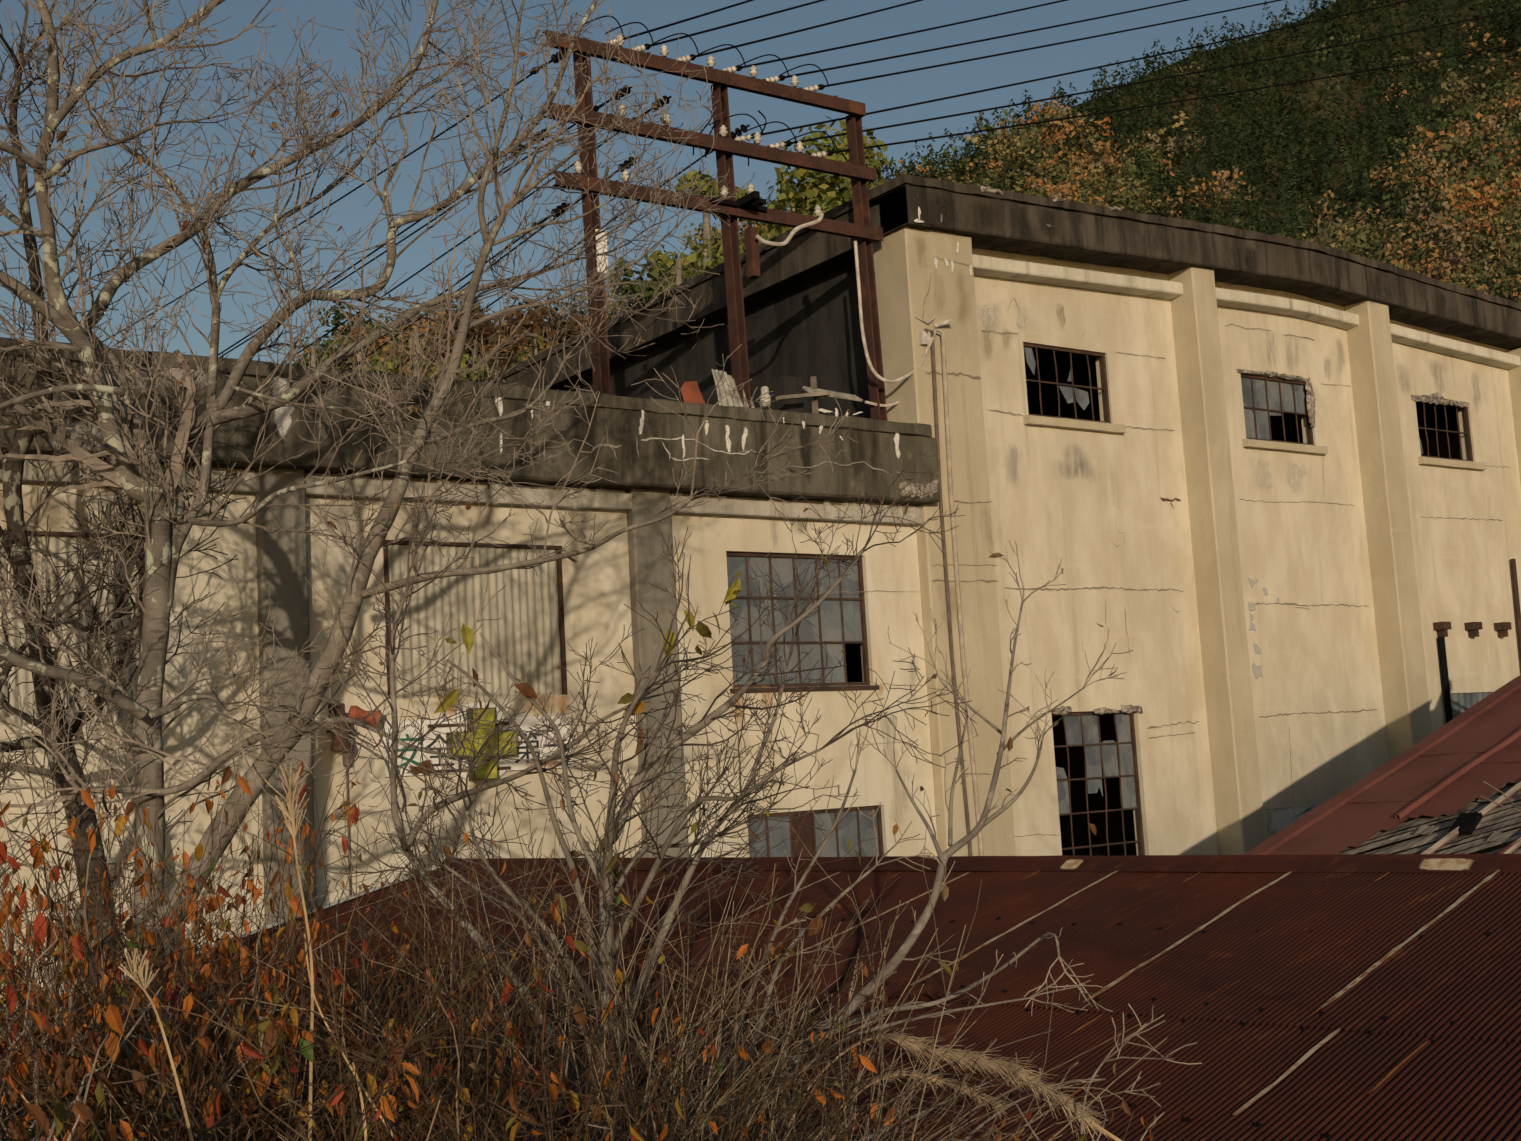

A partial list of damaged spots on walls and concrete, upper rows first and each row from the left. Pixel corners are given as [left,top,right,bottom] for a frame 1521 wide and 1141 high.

leakage [914,200,950,223]
leakage [63,383,99,450]
leakage [108,365,203,405]
leakage [240,376,294,441]
leakage [494,397,503,453]
leakage [622,409,644,446]
rust [680,381,705,404]